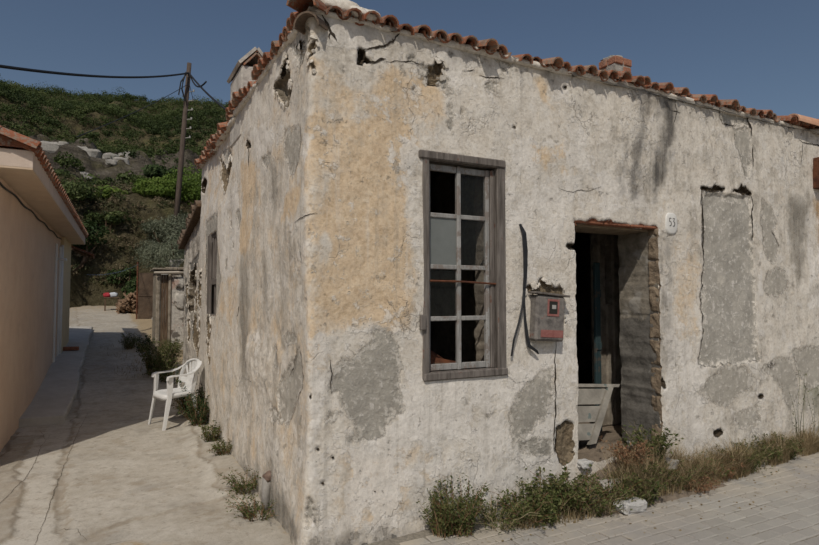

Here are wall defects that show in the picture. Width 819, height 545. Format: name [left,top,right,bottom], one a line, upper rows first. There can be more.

flaking render [273,23,319,110]
crack [358,34,423,65]
flaking render [411,56,466,135]
flaking render [219,149,232,194]
peeling [283,123,301,176]
damp [655,98,675,189]
peeling [174,213,227,365]
peeling [268,328,304,425]
peeling [324,325,405,445]
peeling [508,366,555,457]
crack [553,350,575,466]